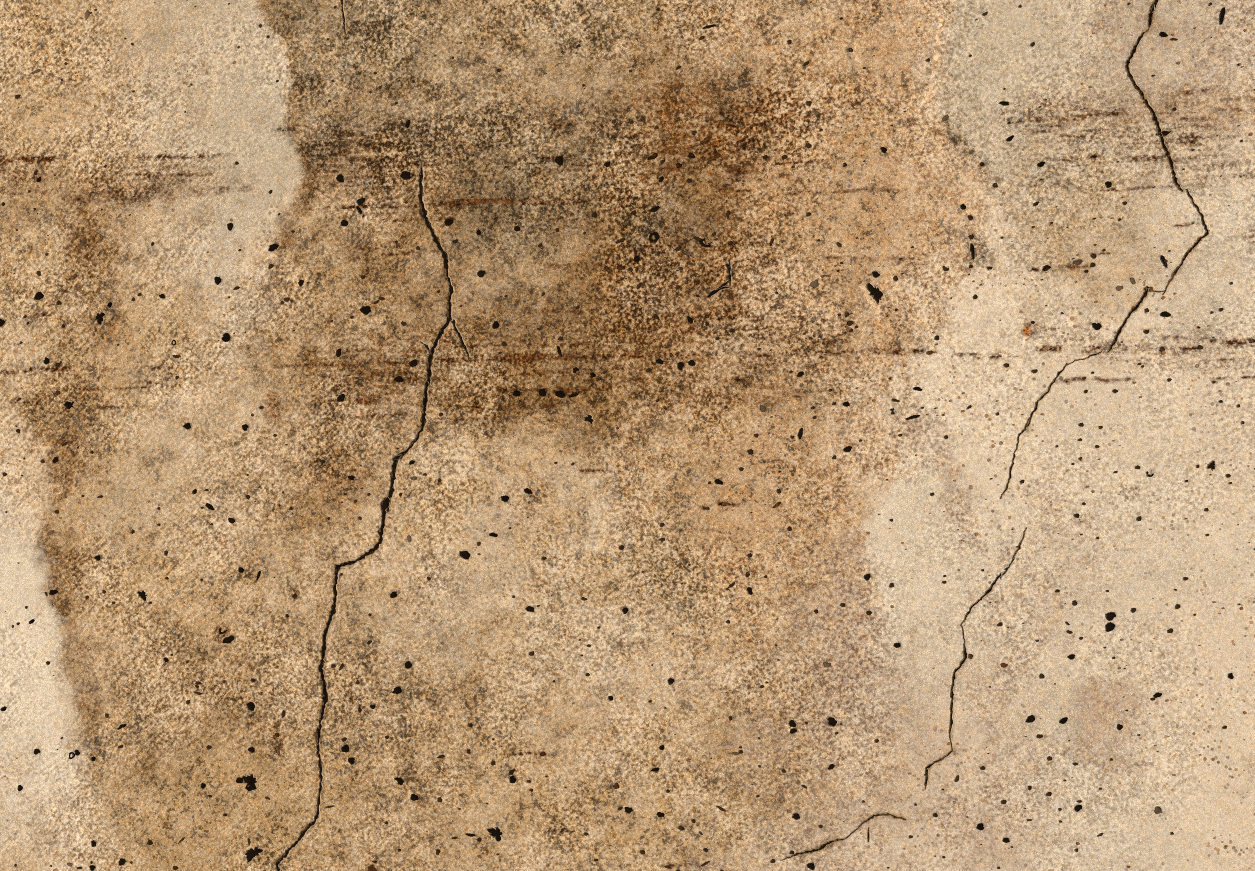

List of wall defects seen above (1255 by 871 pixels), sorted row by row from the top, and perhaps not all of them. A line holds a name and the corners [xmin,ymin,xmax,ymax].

crack [274,164,470,871]
leakage [0,0,891,871]
crack [780,812,906,861]
leakage [943,125,974,155]
crack [924,527,1028,789]
crack [1000,0,1210,499]